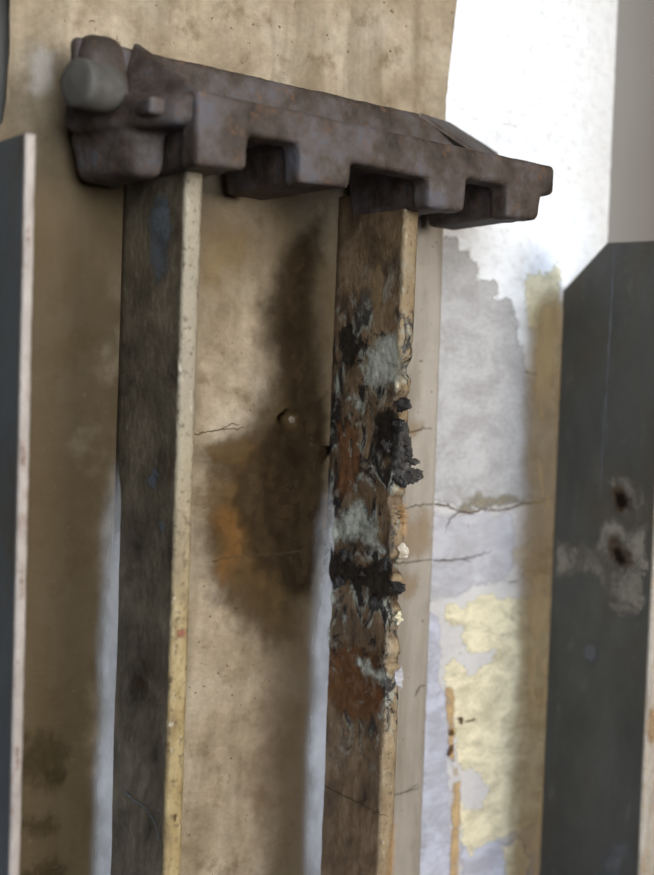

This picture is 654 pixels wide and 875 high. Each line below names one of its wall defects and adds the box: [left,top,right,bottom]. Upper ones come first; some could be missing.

crack [194,423,244,435]
damp [208,377,309,639]
crack [404,502,532,531]
peeling [396,543,409,562]
crack [398,550,491,564]
damp [556,478,649,616]
corrosion [327,629,386,718]
peeling [443,593,528,875]
damp [23,736,66,785]